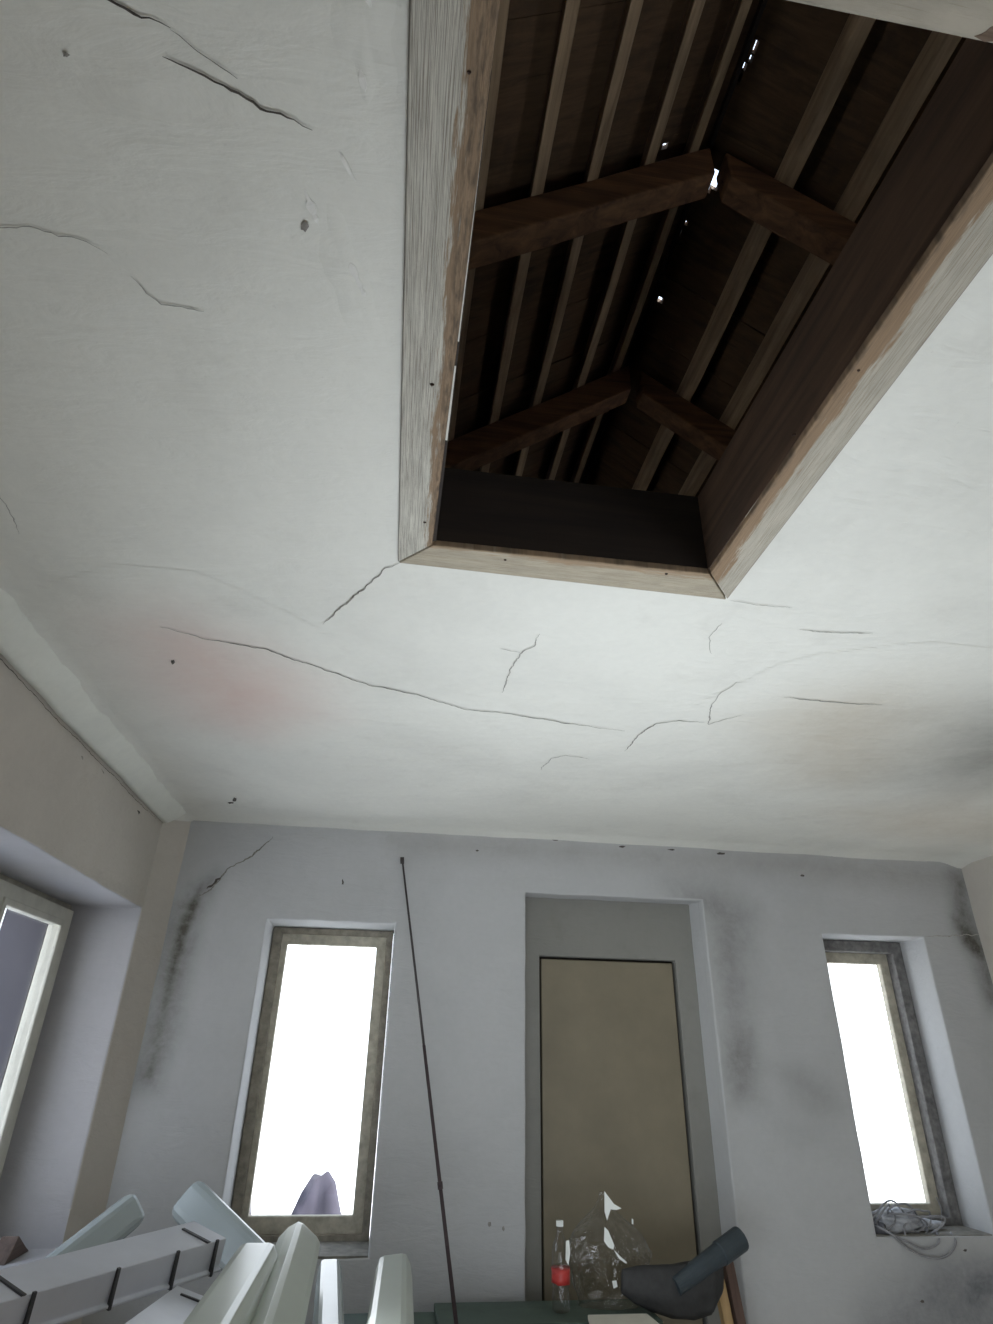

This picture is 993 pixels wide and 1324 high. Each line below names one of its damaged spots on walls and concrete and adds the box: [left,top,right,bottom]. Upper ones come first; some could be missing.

crack [108,0,311,130]
crack [323,563,399,624]
crack [162,627,741,770]
crack [786,697,876,705]
crack [197,837,273,898]
damp [369,641,993,1026]
damp [127,855,237,1111]